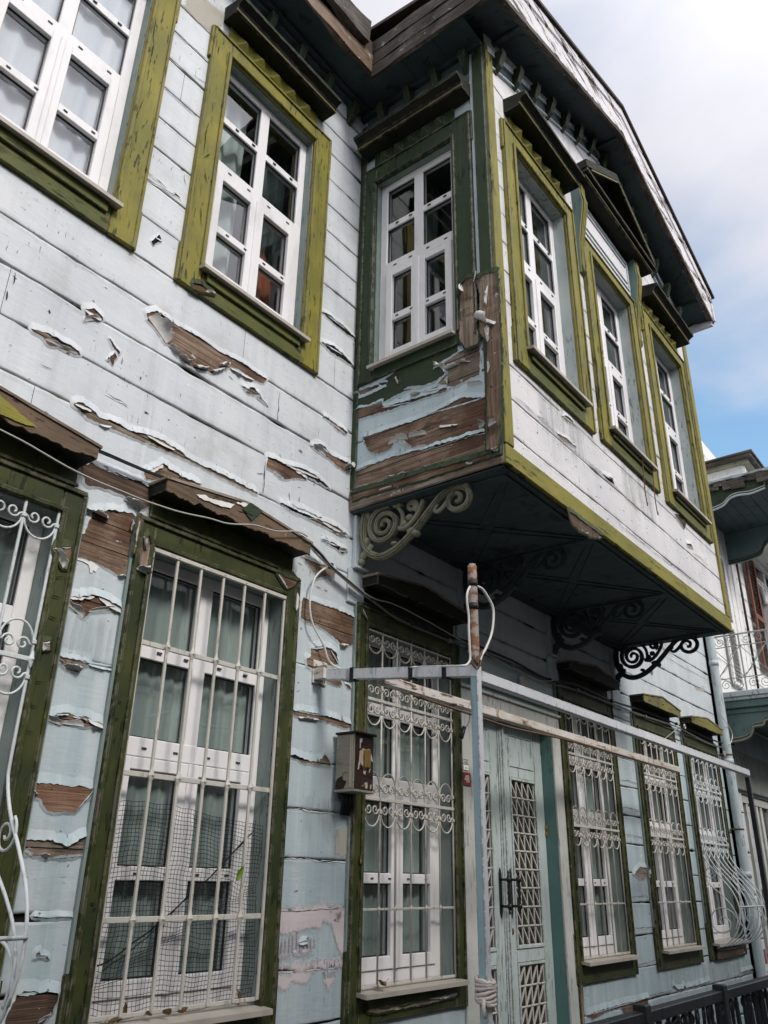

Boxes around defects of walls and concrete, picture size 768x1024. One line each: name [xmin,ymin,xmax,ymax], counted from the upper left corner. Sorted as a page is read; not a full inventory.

peeling [81,302,106,324]
peeling [28,322,83,358]
peeling [143,305,269,408]
peeling [310,266,504,503]
peeling [51,395,262,580]
peeling [264,451,331,491]
peeling [276,495,370,691]
peeling [48,704,103,730]
peeling [34,772,93,816]
peeling [1,979,61,1024]